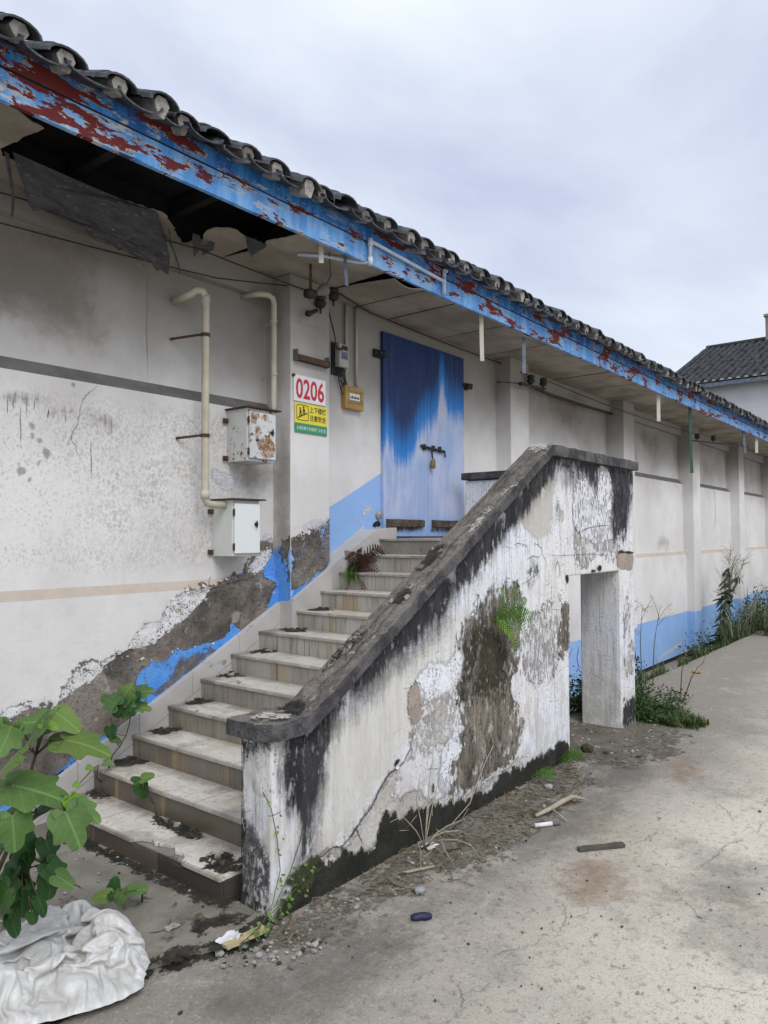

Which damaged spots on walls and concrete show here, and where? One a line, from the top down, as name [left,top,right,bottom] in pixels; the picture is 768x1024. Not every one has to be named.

corrosion [250,411,275,459]
flaking render [0,729,77,780]
flaking render [0,516,330,742]
crack [321,729,414,857]
water stain [274,609,571,918]
flaking render [408,679,438,724]
flaking render [446,577,570,795]